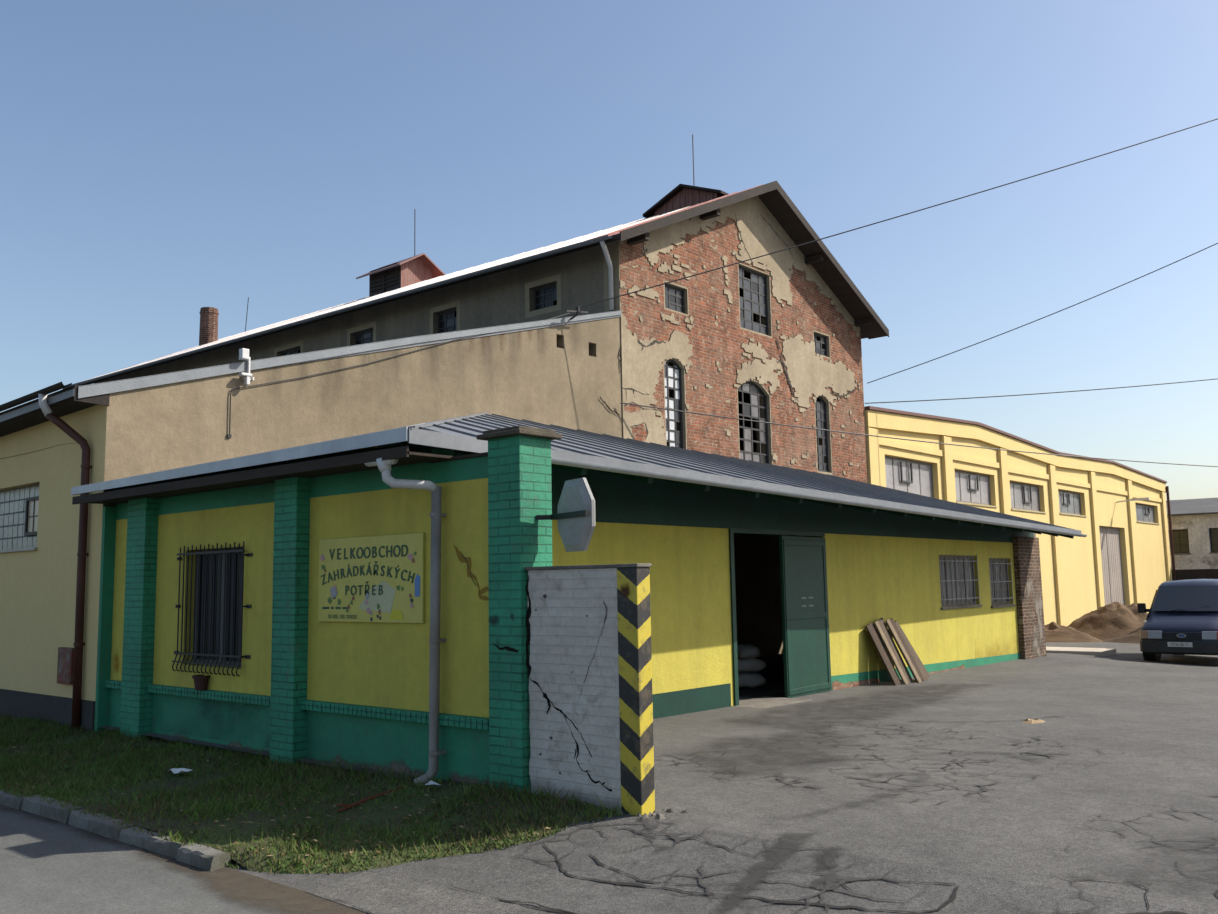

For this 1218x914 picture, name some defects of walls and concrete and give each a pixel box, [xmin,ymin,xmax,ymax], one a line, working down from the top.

flaking render [619,217,868,483]
crack [453,544,489,600]
crack [494,639,519,652]
crack [530,601,612,792]
crack [654,721,1067,804]